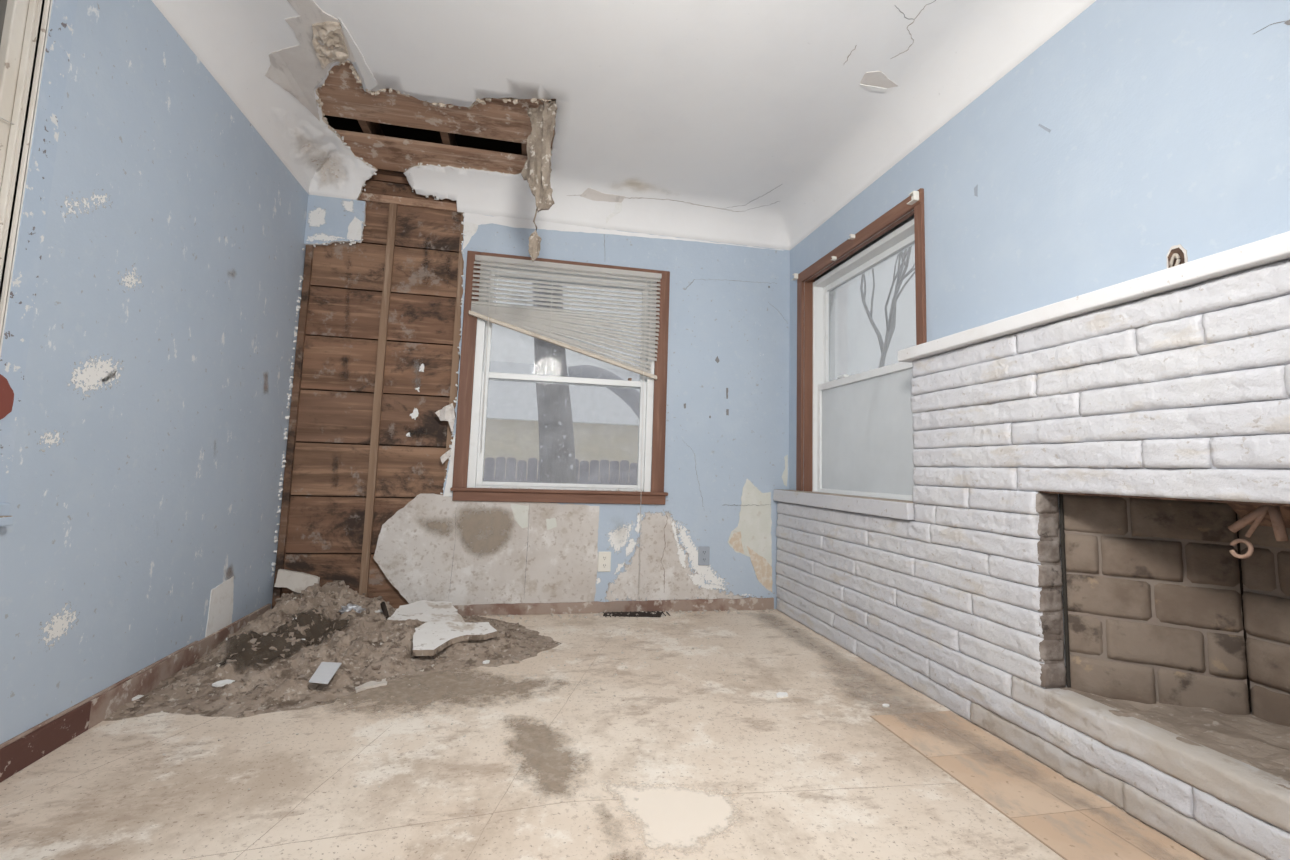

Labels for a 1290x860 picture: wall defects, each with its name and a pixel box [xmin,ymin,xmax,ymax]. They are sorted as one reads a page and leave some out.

crack [891,0,936,59]
peeling [265,0,551,254]
spalling [68,355,124,397]
flaking render [272,276,304,576]
water stain [426,510,512,554]
flaking render [373,419,788,605]
spalling [41,603,79,648]